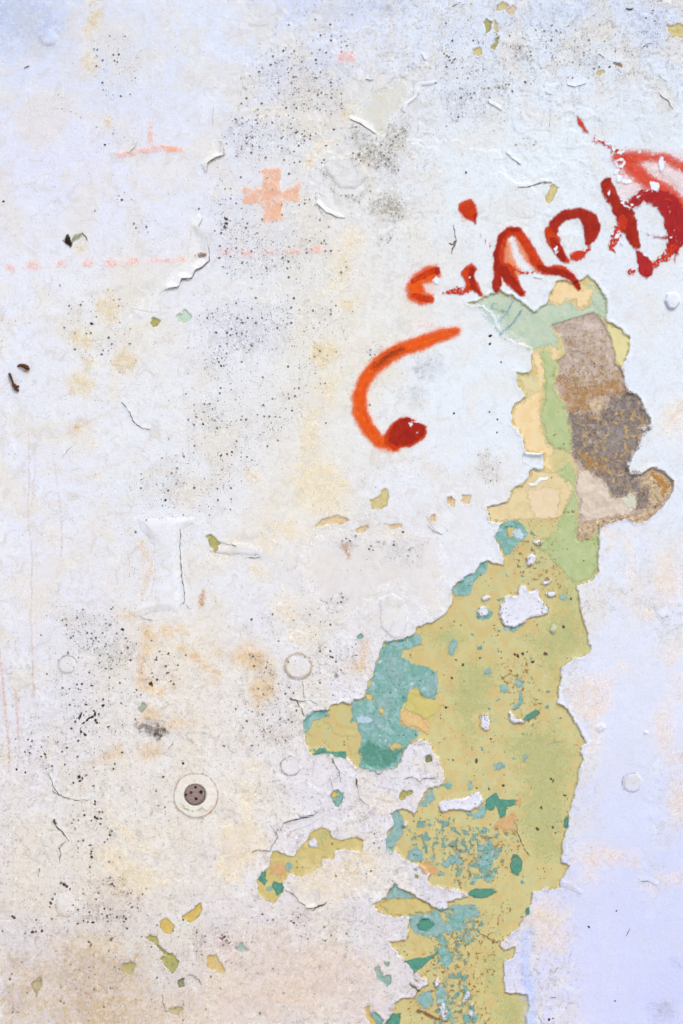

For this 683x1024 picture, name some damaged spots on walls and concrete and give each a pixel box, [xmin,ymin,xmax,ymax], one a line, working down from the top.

peeling [473,2,517,56]
peeling [132,213,210,327]
mould [129,4,409,521]
crack [179,530,191,610]
peeling [302,275,674,1024]
crack [252,814,315,852]
peeling [257,827,363,909]
peeling [121,962,136,976]
peeling [146,903,202,988]
peeling [206,954,225,974]